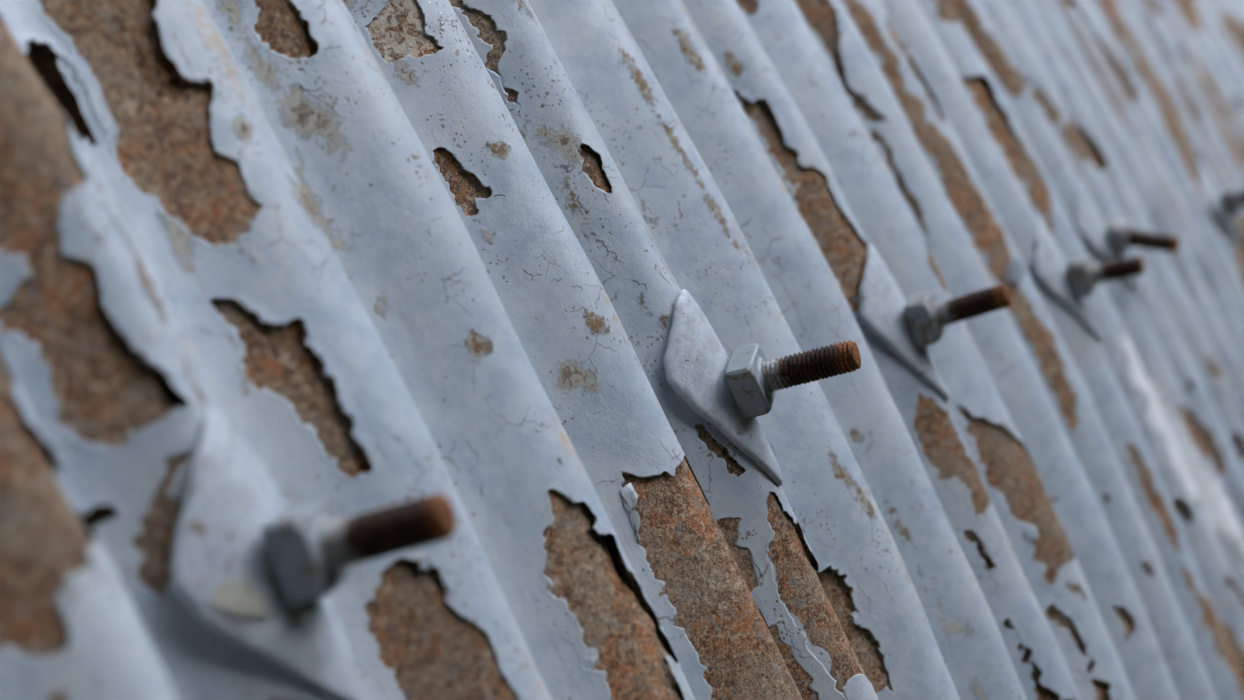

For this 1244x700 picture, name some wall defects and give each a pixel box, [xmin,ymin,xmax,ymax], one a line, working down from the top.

peeling [0,0,270,666]
peeling [244,0,328,65]
peeling [205,290,382,486]
peeling [361,0,527,118]
peeling [732,86,868,314]
peeling [794,0,1080,433]
peeling [930,0,1111,239]
peeling [354,549,526,700]
peeling [532,420,896,700]
peeling [909,390,1116,700]